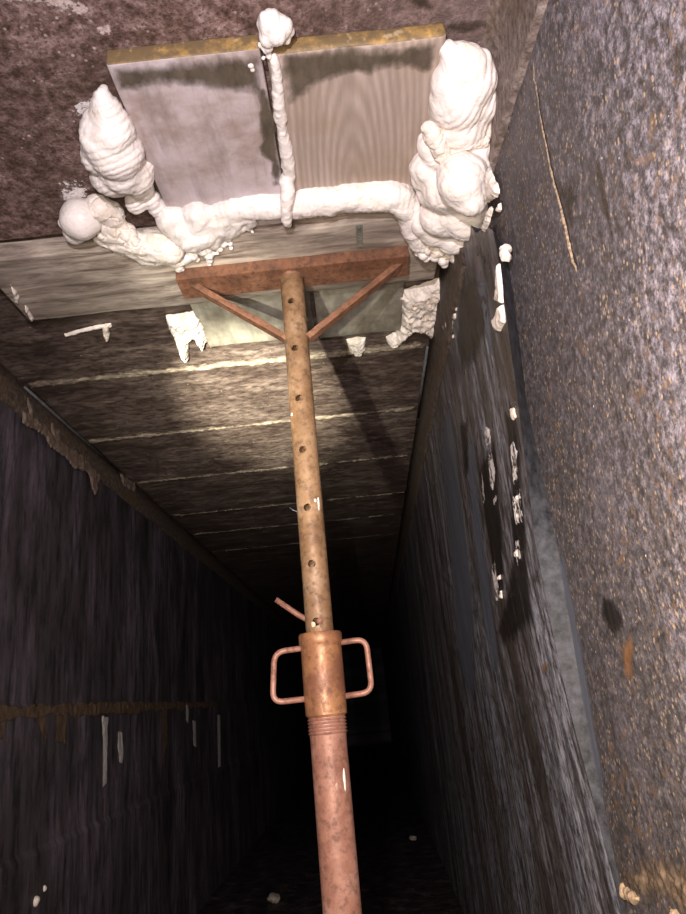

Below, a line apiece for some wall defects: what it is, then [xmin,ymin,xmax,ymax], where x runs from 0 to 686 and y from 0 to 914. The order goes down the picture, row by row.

peeling [22,397,101,495]
spalling [619,861,686,914]